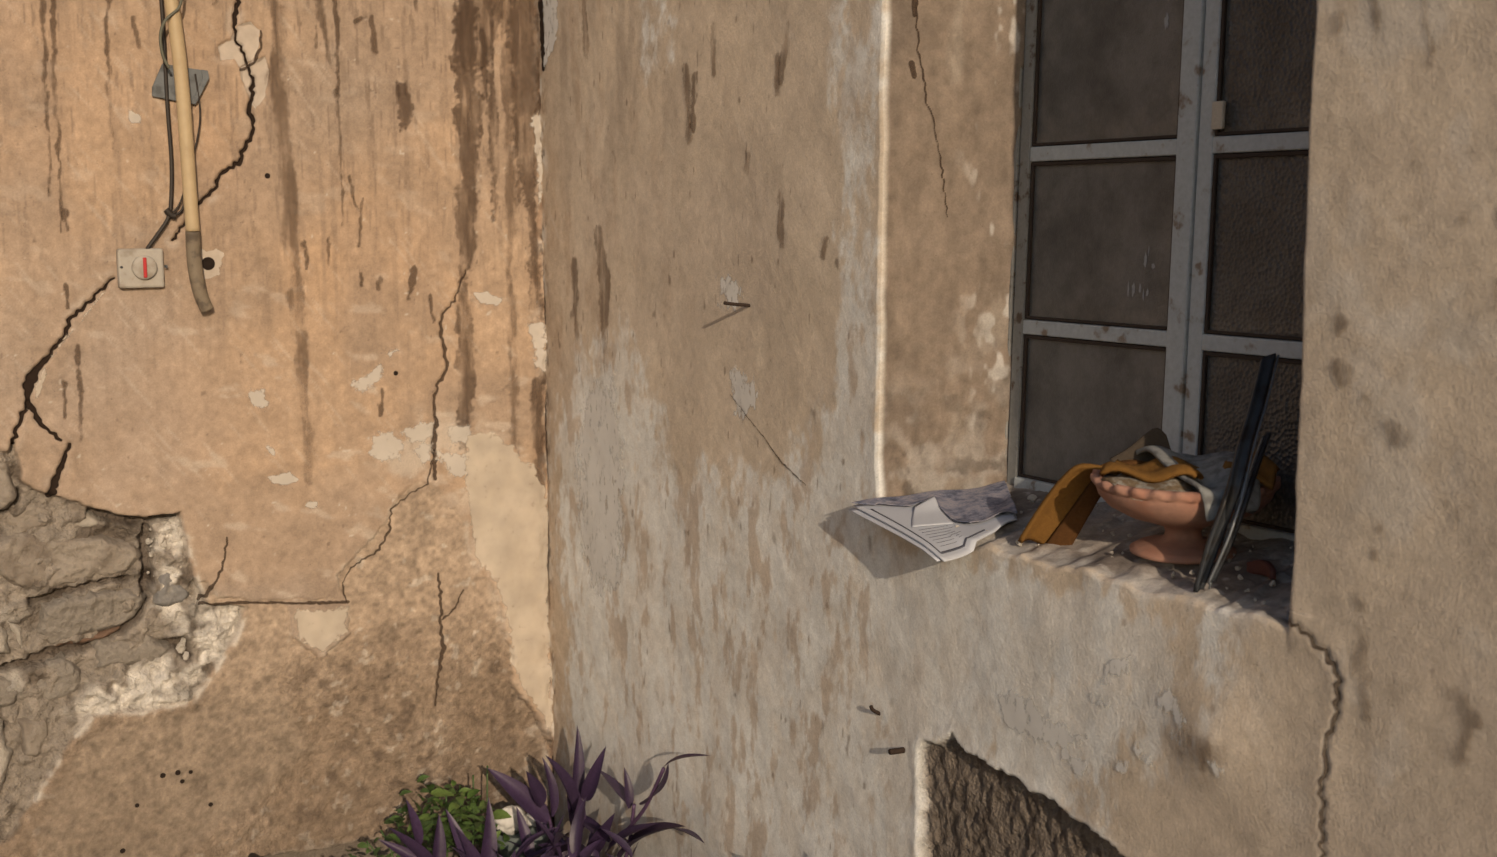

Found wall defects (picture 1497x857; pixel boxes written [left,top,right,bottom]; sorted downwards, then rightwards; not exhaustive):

leakage [40,0,57,78]
crack [171,0,269,241]
leakage [450,0,542,292]
crack [10,277,115,497]
leakage [62,345,84,420]
peeling [248,389,268,408]
crack [197,270,466,606]
peeling [351,349,398,392]
leakage [456,313,476,427]
peeling [574,378,625,600]
peeling [0,422,553,857]
crack [1289,618,1342,857]